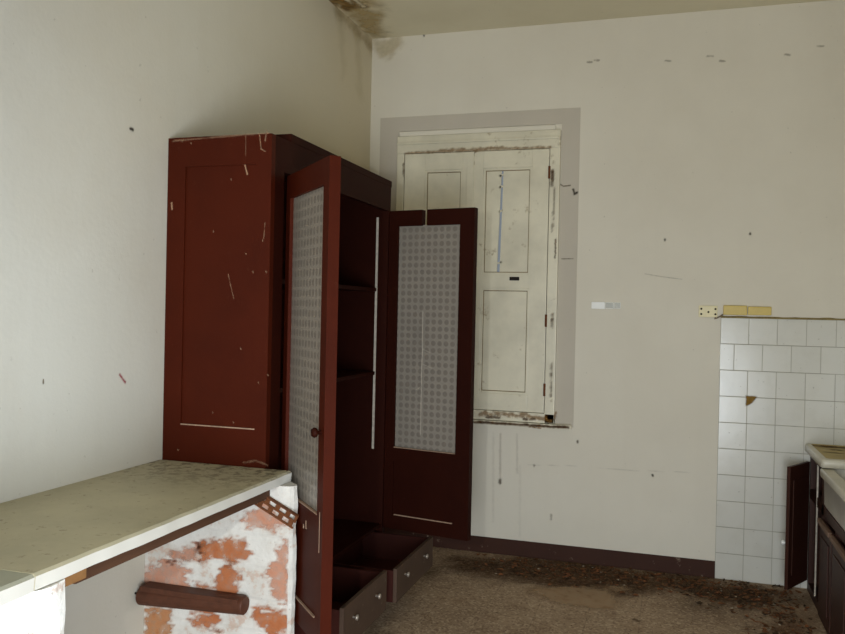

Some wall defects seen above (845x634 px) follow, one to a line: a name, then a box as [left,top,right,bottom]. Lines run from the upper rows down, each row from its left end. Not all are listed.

water stain [330,0,381,35]
peeling [240,503,287,533]
peeling [144,537,253,593]
peeling [251,539,289,634]
peeling [144,607,172,634]
peeling [188,611,221,633]